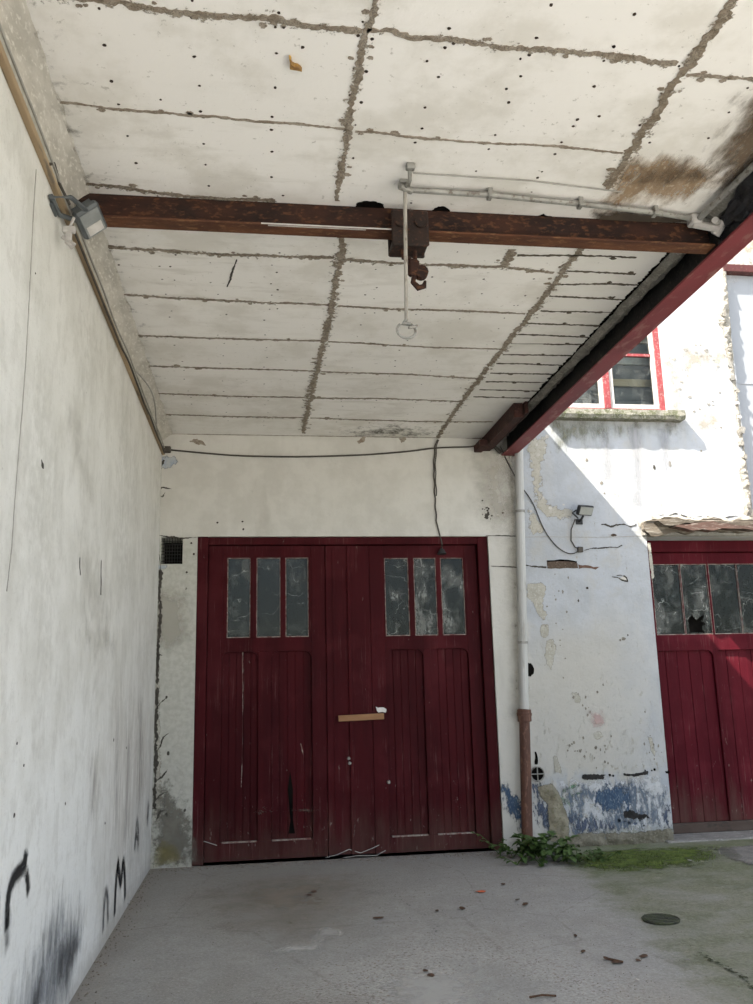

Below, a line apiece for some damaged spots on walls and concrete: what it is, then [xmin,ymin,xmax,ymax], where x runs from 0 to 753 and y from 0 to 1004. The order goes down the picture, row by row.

spalling [637,271,753,527]
peeling [526,435,572,535]
flaking render [526,559,598,579]
peeling [527,582,566,670]
flaking render [553,731,674,847]